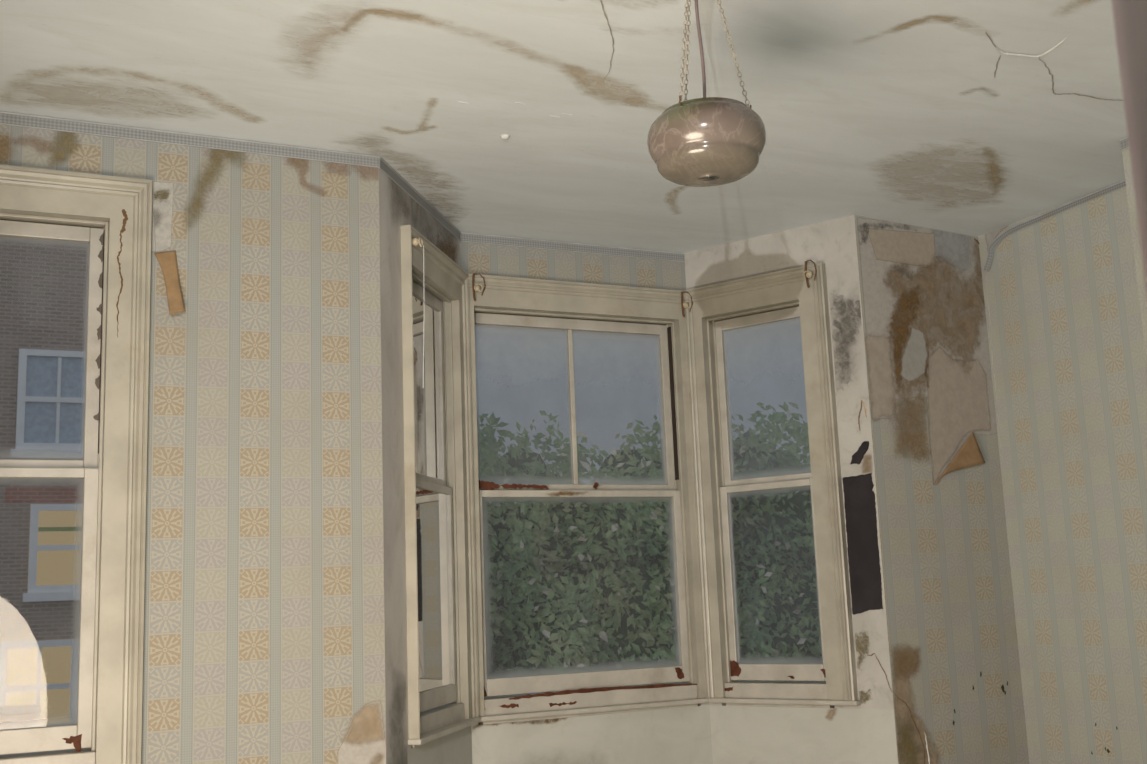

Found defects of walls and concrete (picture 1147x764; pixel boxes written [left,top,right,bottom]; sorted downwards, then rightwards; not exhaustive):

crack [600,0,614,82]
damp [0,131,75,161]
damp [189,149,239,217]
crack [116,209,128,337]
damp [834,300,861,379]
flaking render [857,180,1126,483]
flaking render [338,701,386,764]
damp [894,647,938,764]